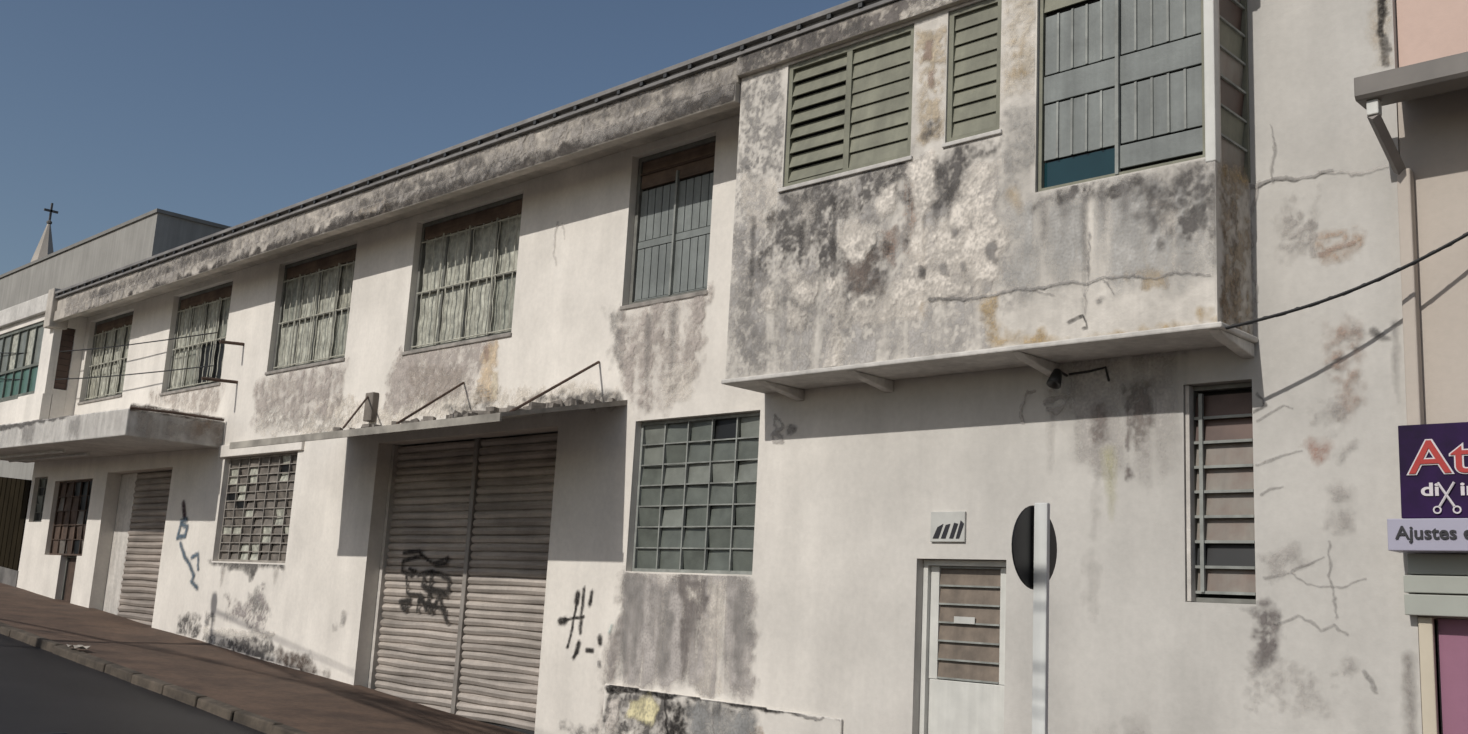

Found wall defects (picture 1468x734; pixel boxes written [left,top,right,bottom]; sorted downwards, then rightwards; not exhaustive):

leakage [64,0,1213,374]
crack [928,242,1210,301]
crack [1250,143,1388,323]
leakage [610,286,712,411]
leakage [1069,354,1176,477]
leakage [178,562,316,673]
leakage [568,573,755,734]